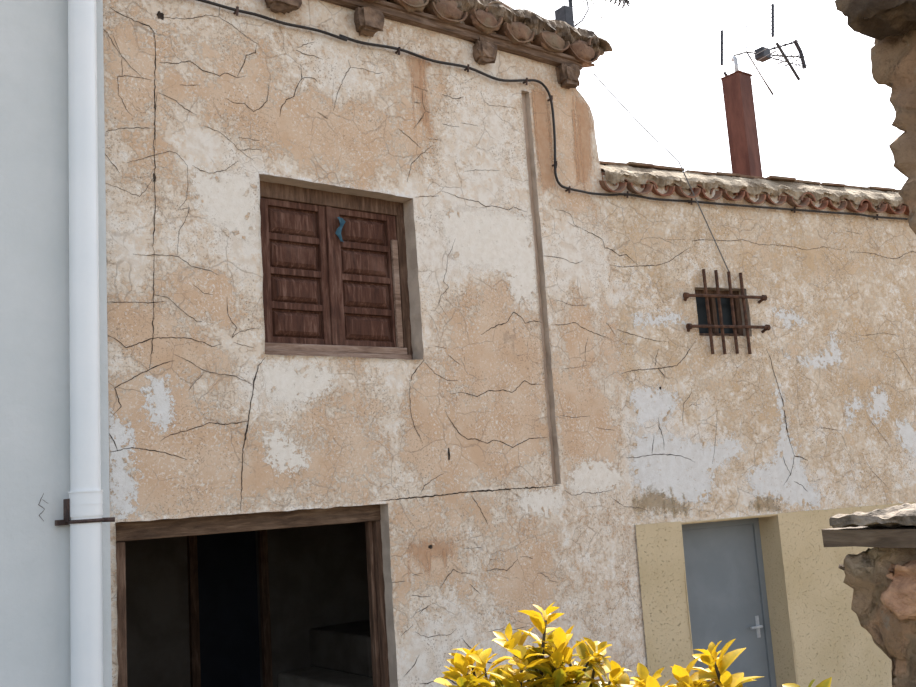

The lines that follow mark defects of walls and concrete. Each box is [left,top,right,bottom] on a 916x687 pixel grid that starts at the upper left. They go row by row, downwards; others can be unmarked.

crack [229,42,321,114]
crack [103,7,264,509]
crack [481,299,696,377]
flaking render [109,368,183,520]
flaking render [256,358,341,478]
crack [410,346,545,448]
crack [382,473,649,524]
flaking render [512,380,825,523]
crack [626,419,717,464]
crack [766,349,808,491]
crack [392,547,556,664]